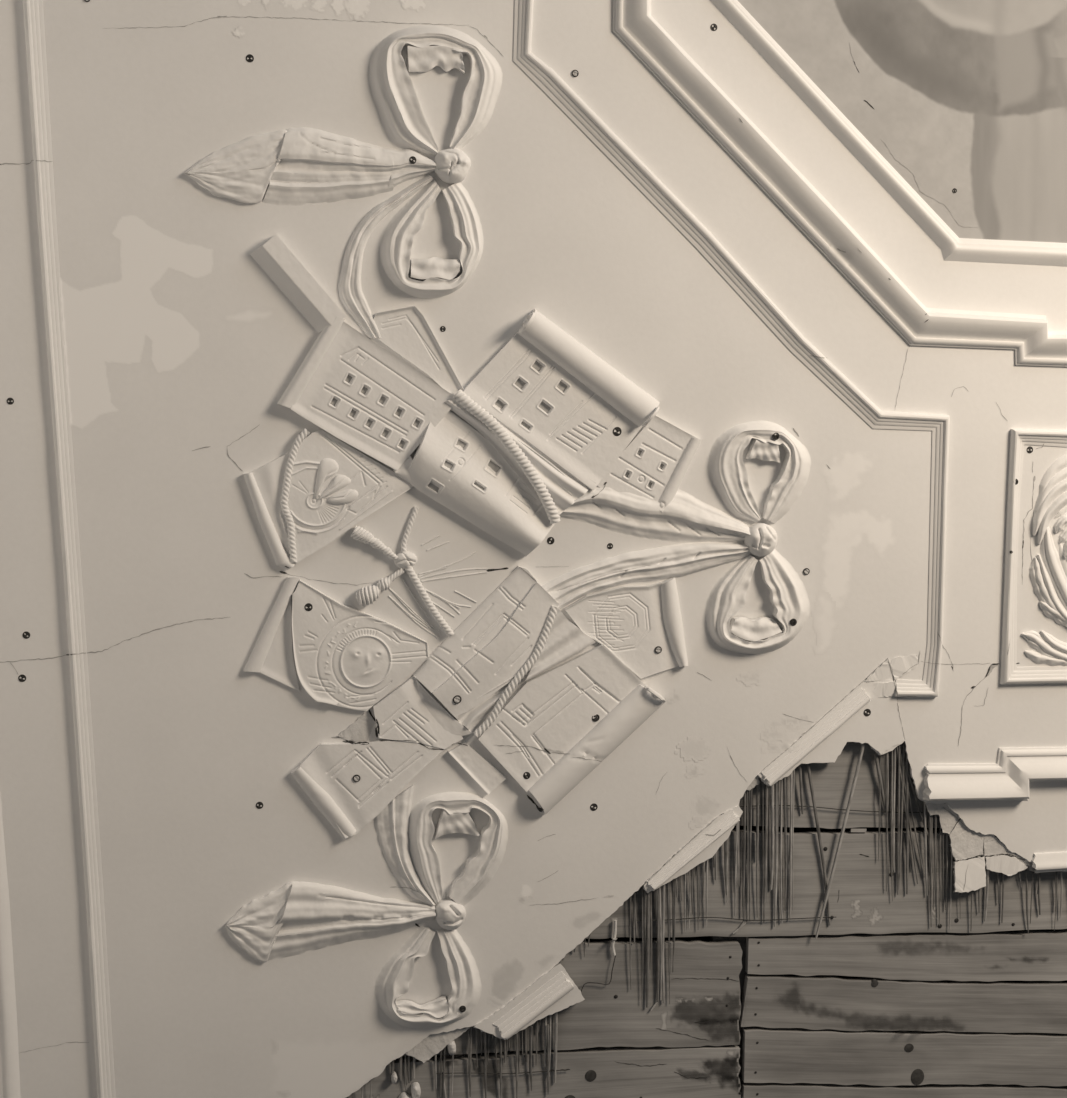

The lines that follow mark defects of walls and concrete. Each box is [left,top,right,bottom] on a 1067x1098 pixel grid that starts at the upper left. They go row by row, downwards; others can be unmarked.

crack [105,16,503,56]
crack [6,617,227,674]
flaking render [865,654,918,697]
crack [729,634,1019,777]
flaking render [925,803,1038,893]
peeling [266,1027,469,1098]
damp [705,1054,740,1089]